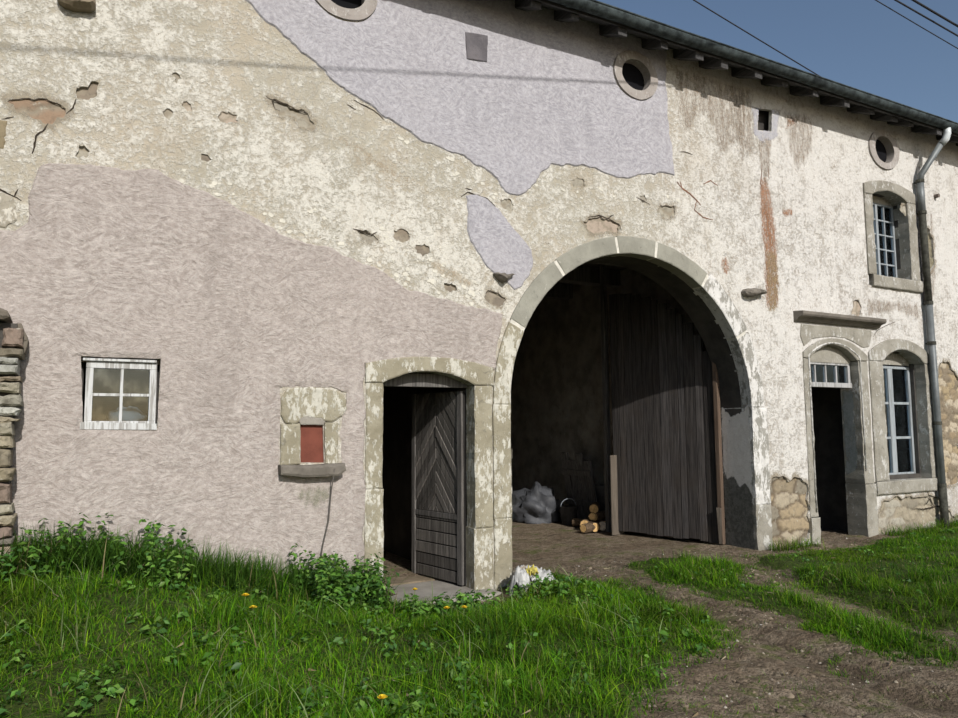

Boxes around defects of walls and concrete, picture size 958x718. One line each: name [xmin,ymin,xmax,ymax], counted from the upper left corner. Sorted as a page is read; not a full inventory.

spalling [1,82,98,130]
crack [32,99,76,154]
spalling [267,95,316,132]
spalling [561,178,622,237]
corrosion [760,178,792,310]
spalling [938,359,958,488]
peeling [721,406,754,503]
spalling [770,472,810,548]
spalling [878,492,958,535]